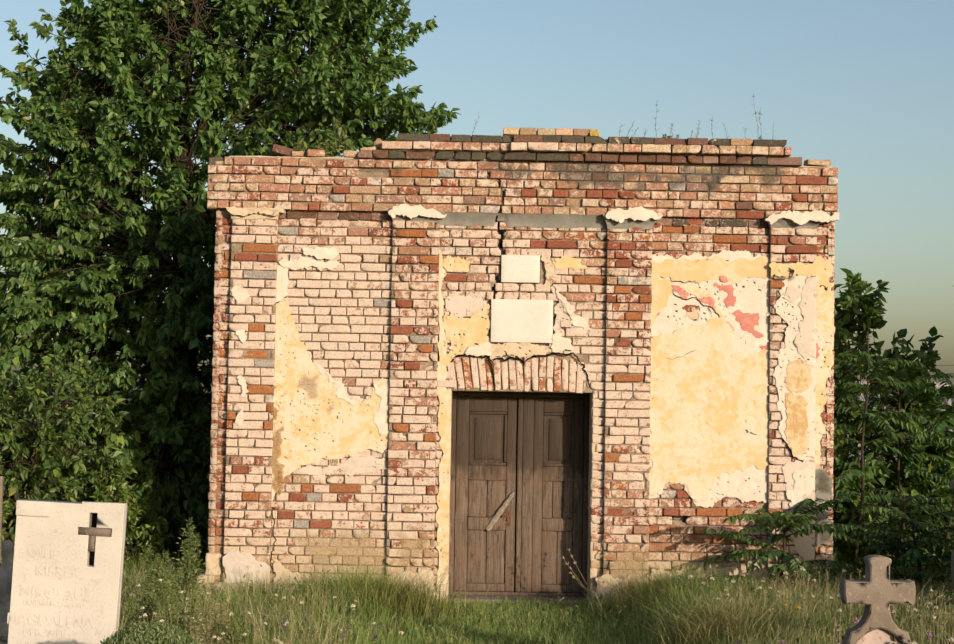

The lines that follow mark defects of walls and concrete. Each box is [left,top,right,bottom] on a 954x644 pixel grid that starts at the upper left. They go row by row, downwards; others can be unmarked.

flaking render [230,286,250,303]
flaking render [235,375,249,426]
flaking render [271,247,390,507]
crack [487,171,506,299]
flaking render [436,250,574,591]
flaking render [552,256,589,271]
flaking render [562,300,588,329]
peeling [649,250,834,523]